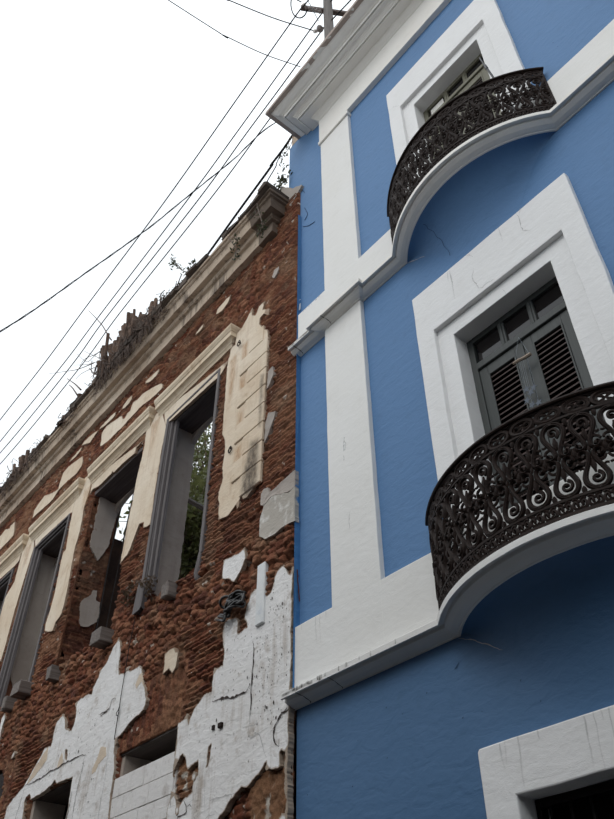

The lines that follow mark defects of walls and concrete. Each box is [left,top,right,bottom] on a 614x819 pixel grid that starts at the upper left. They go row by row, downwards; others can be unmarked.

peeling [216,295,233,315]
peeling [33,369,164,518]
peeling [0,522,16,551]
peeling [89,497,117,561]
peeling [259,487,299,540]
peeling [222,547,248,583]
peeling [79,590,100,627]
peeling [163,647,182,676]
peeling [27,739,48,784]
peeling [57,745,106,780]
spalling [175,757,198,816]
spalling [225,752,287,819]